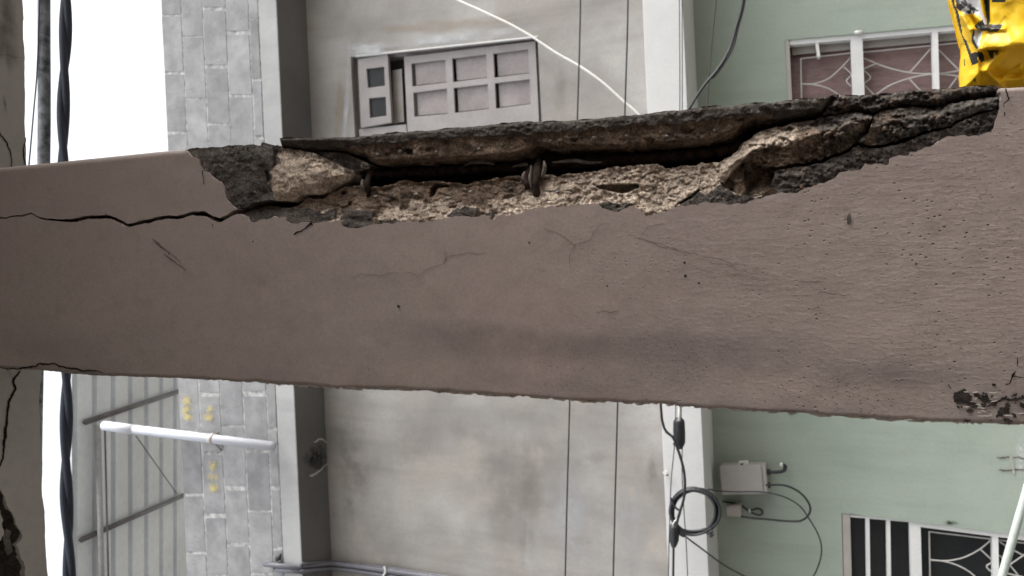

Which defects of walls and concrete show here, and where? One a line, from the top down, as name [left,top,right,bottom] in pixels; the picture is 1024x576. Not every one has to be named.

spalling [187,85,999,228]
crack [47,213,226,226]
crack [0,363,102,466]
spalling [266,383,1024,426]